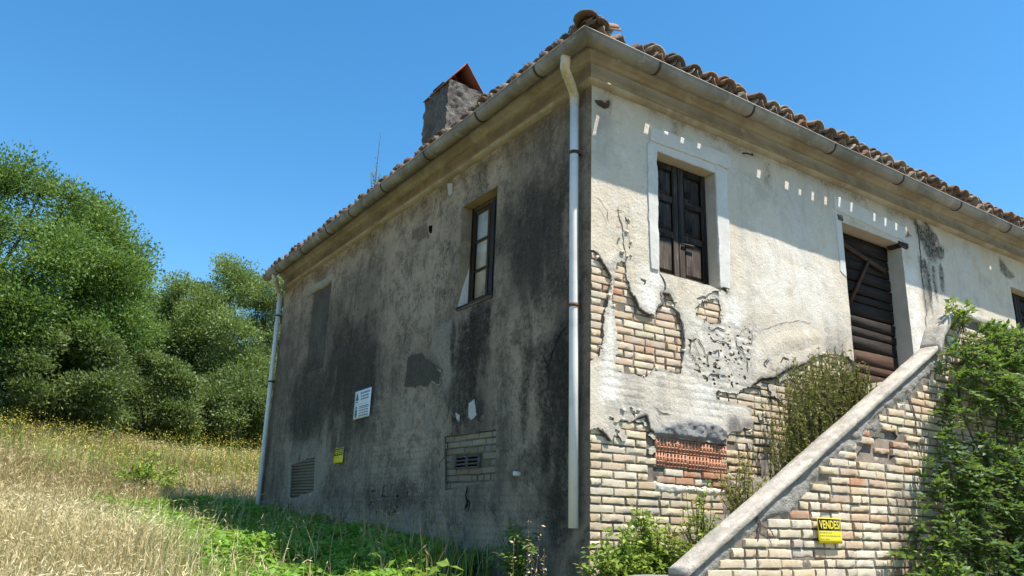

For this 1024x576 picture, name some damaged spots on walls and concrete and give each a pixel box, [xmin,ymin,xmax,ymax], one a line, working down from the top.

leakage [906,223,944,310]
leakage [290,314,380,445]
flaking render [404,320,459,389]
crack [439,443,470,510]
leakage [448,302,490,432]
leakage [519,319,579,547]
flaking render [587,217,853,576]
spalling [873,432,890,461]